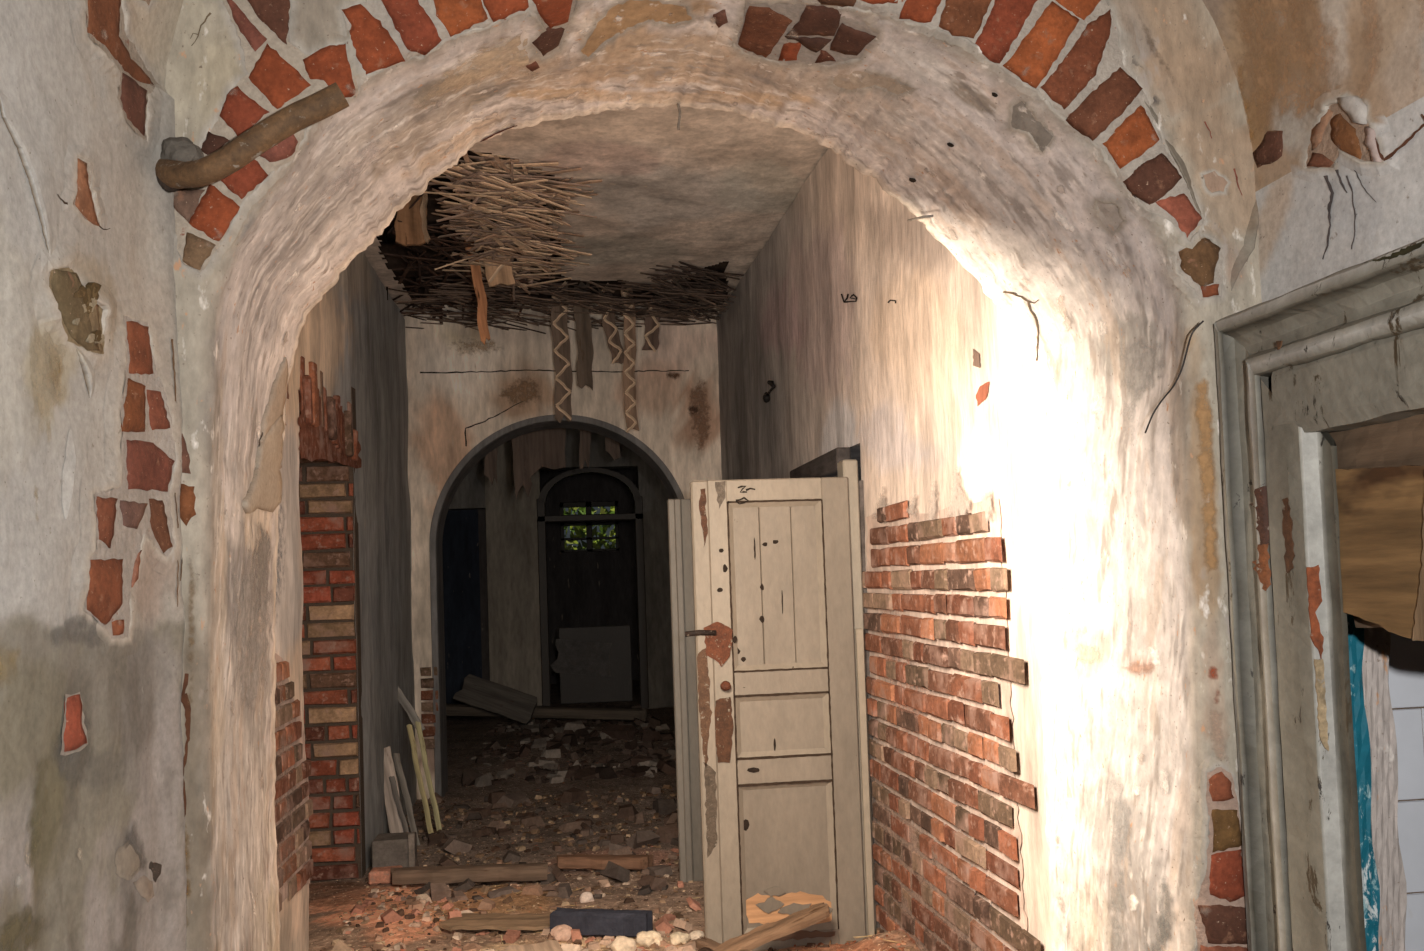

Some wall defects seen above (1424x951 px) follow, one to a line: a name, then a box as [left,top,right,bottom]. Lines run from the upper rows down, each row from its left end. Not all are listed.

spalling [68,0,167,158]
spalling [173,0,1259,319]
spalling [1253,82,1424,183]
spalling [0,89,196,658]
spalling [60,692,88,756]
flaking render [242,332,362,912]
spalling [862,470,1041,951]
spalling [1178,754,1248,951]